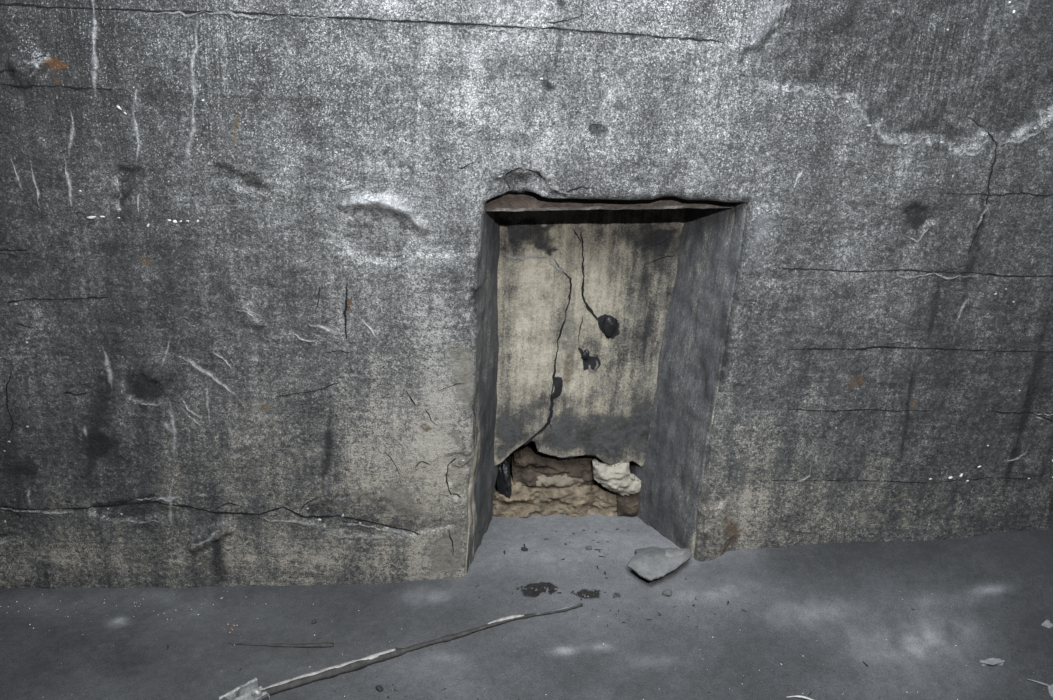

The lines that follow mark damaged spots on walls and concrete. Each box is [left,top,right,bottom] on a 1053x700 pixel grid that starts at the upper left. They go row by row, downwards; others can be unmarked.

crack [0,3,724,44]
crack [777,117,1053,280]
crack [508,230,598,446]
crack [797,342,1053,352]
crack [386,453,469,497]
spalling [492,441,641,518]
crack [0,497,420,536]